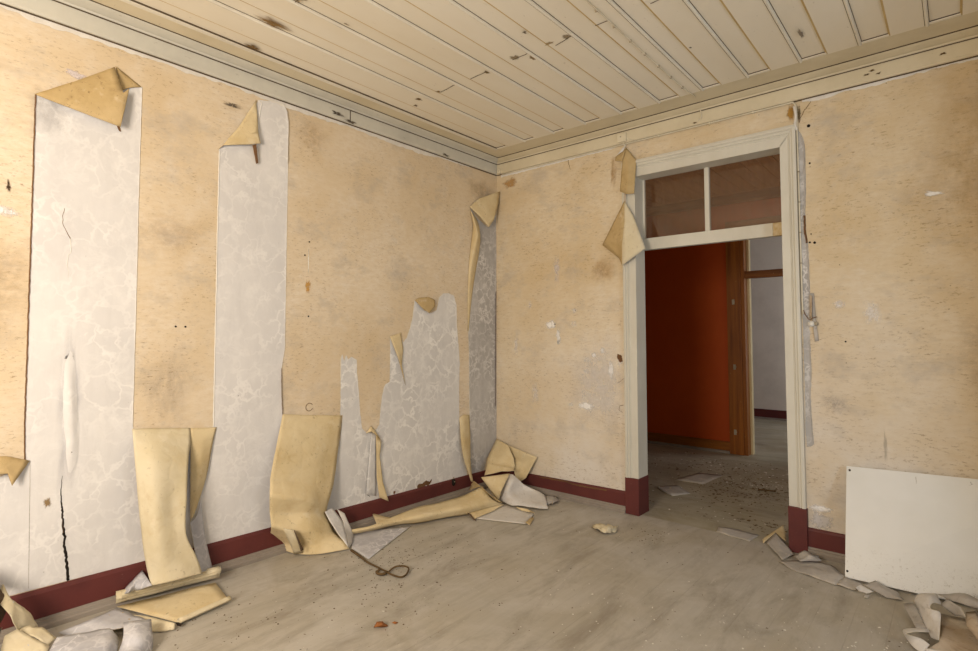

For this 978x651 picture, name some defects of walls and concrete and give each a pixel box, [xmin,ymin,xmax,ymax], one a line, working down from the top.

crack [60,476,70,581]
peeling [0,87,145,596]
peeling [186,100,289,548]
peeling [327,210,497,510]